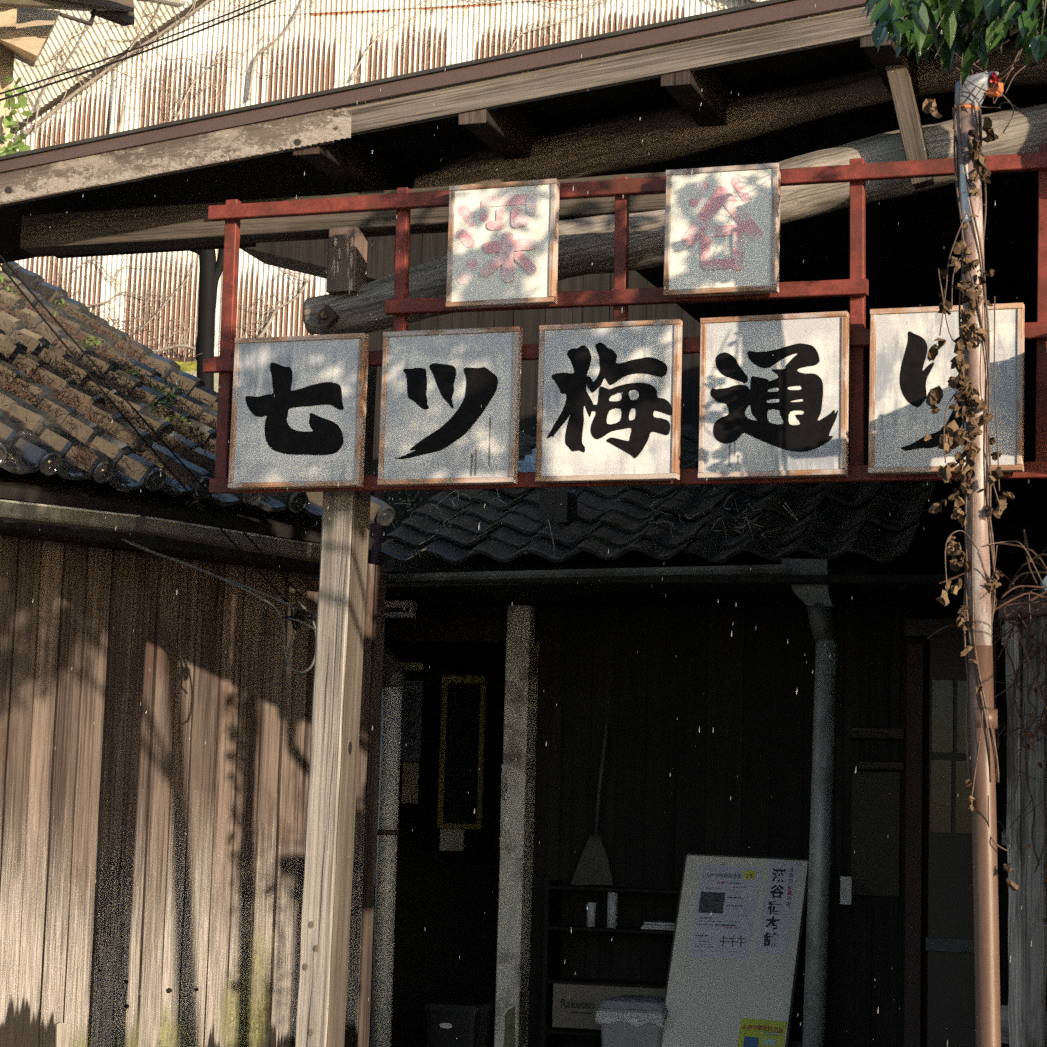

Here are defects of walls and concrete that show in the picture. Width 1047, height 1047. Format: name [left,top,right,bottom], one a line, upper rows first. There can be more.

corrosion [36,87,121,149]
corrosion [140,48,227,128]
corrosion [258,35,335,104]
corrosion [26,256,102,316]
corrosion [125,253,199,358]
corrosion [236,266,315,338]
water stain [0,833,303,1047]